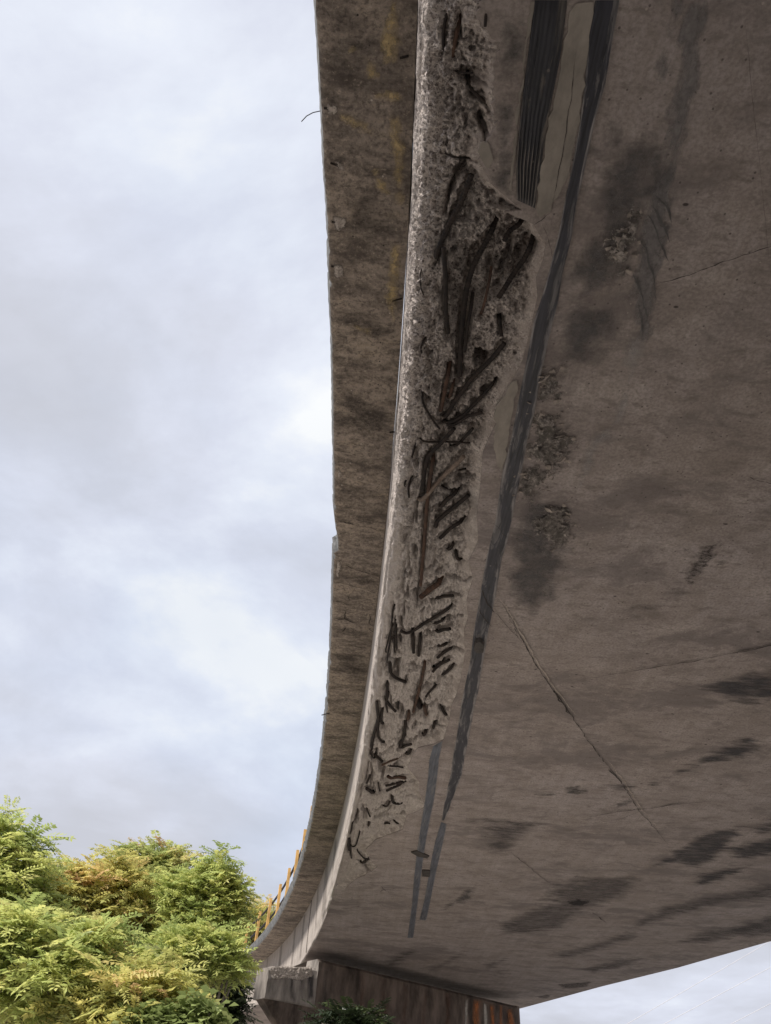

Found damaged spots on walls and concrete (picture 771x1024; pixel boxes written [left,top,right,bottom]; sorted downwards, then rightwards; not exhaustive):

peeling [603,206,645,276]
spalling [333,0,545,890]
peeling [512,364,578,552]
damp [512,504,558,604]
crack [480,590,706,841]
damp [697,869,739,884]